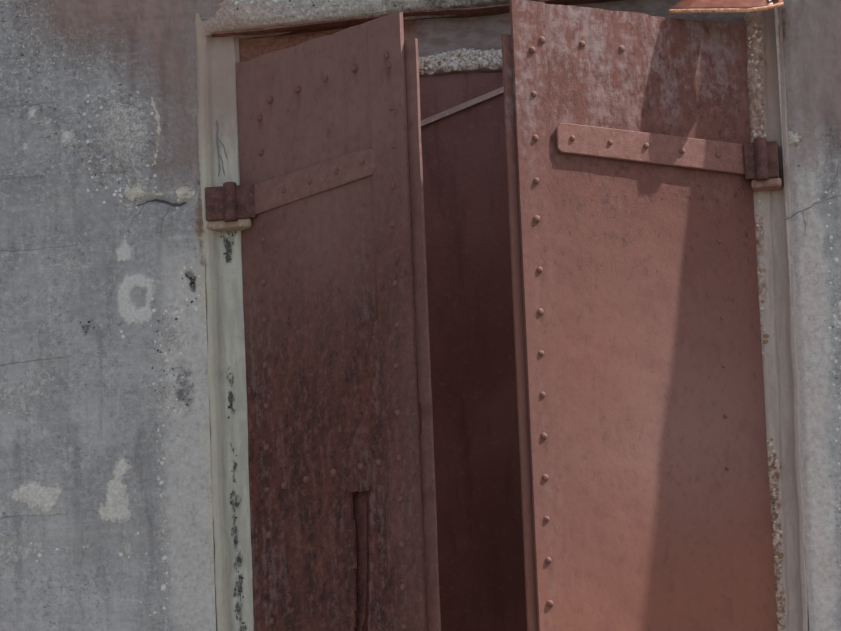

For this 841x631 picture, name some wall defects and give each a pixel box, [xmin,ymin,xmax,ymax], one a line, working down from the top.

rust [239,31,332,62]
crack [84,171,195,232]
crack [785,165,841,227]
peeling [149,266,201,631]